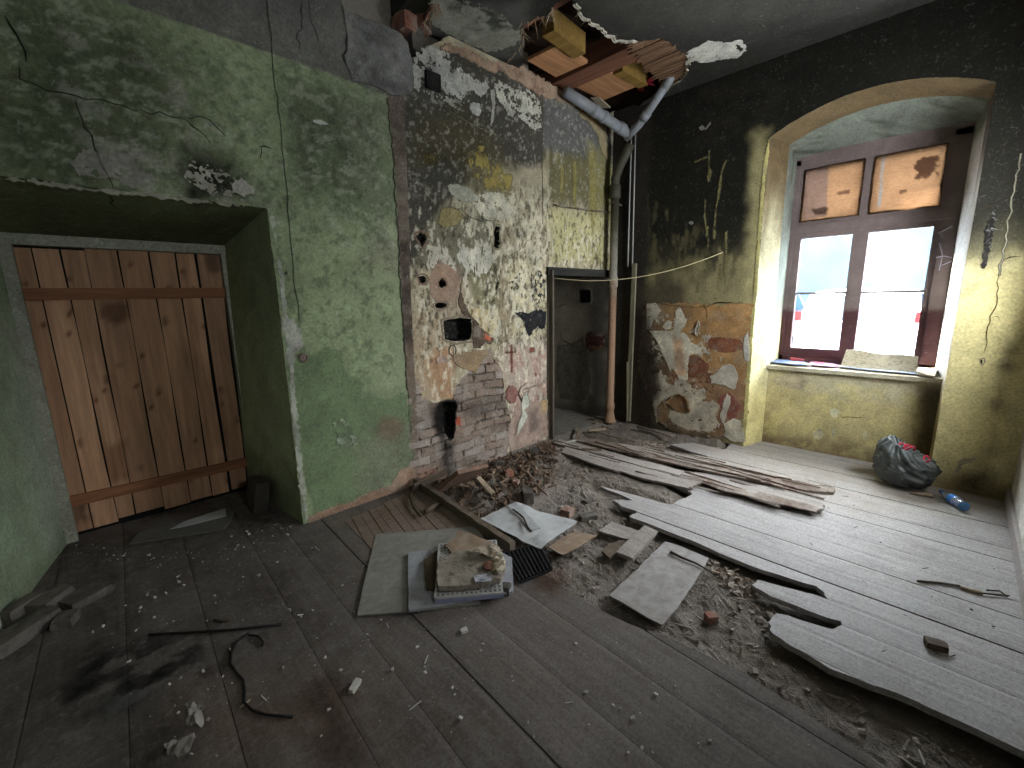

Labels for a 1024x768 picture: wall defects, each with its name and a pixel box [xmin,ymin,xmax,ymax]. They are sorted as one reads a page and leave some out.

crack [4,15,226,208]
peeling [5,142,255,207]
crack [260,0,319,322]
flaking render [270,215,605,523]
peeling [448,184,546,307]
spalling [413,42,608,160]
flaking render [642,140,769,443]
crack [978,153,1023,351]